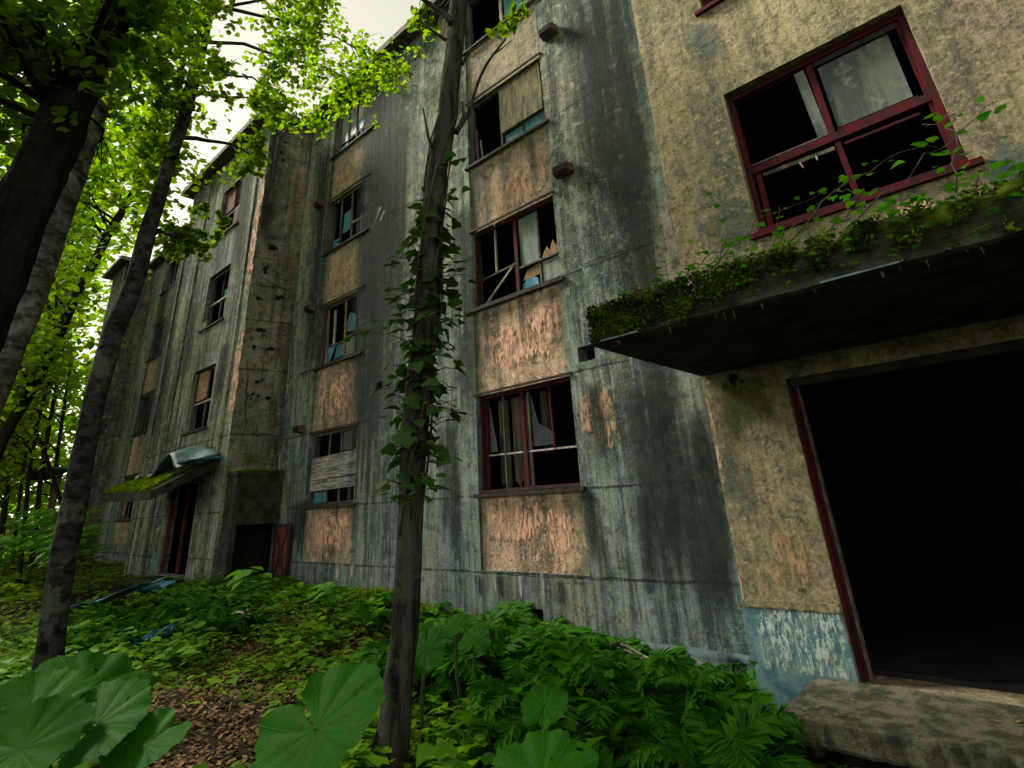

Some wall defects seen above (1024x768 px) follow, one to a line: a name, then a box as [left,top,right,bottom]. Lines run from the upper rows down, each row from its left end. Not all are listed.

water stain [577,0,658,296]
water stain [286,134,333,393]
water stain [138,281,206,429]
water stain [216,344,228,440]
water stain [583,496,604,561]
water stain [589,385,605,452]
water stain [625,360,752,603]
peeling [757,609,849,680]